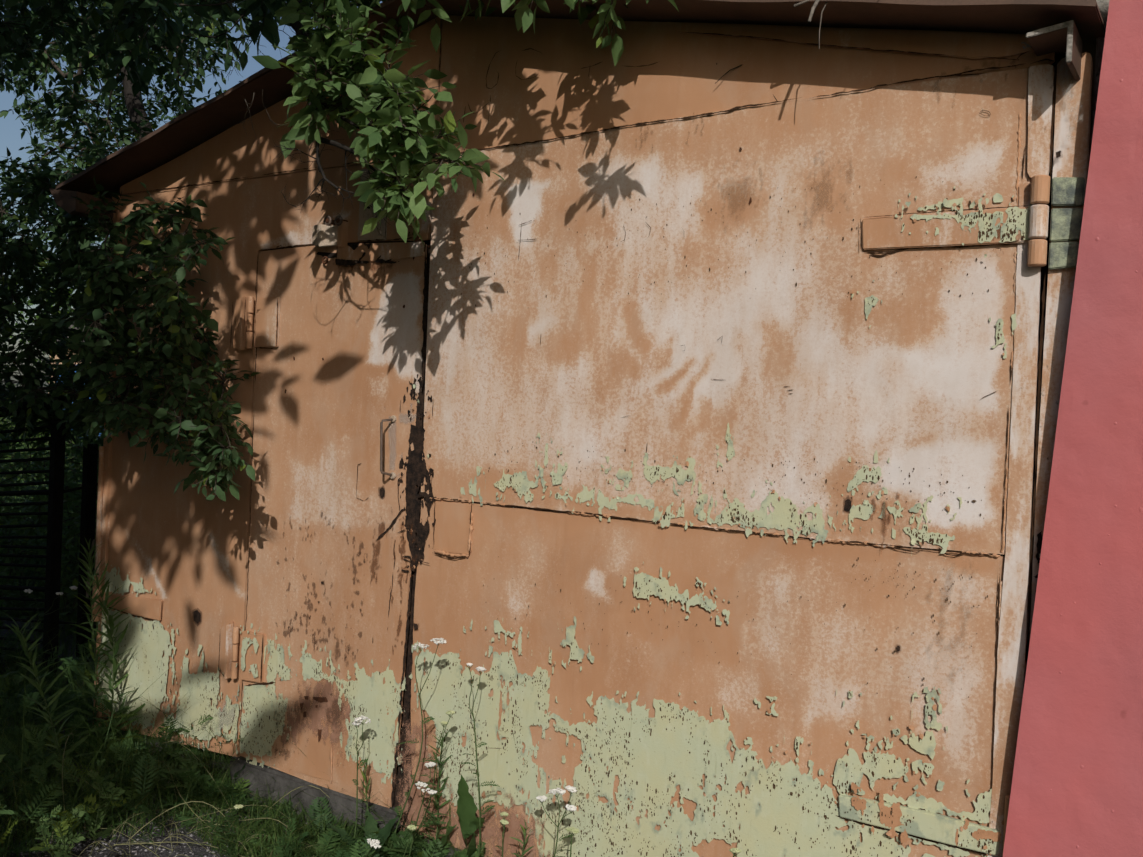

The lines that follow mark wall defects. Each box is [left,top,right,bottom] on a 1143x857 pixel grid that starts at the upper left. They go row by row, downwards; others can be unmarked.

peeling [97,562,1004,857]